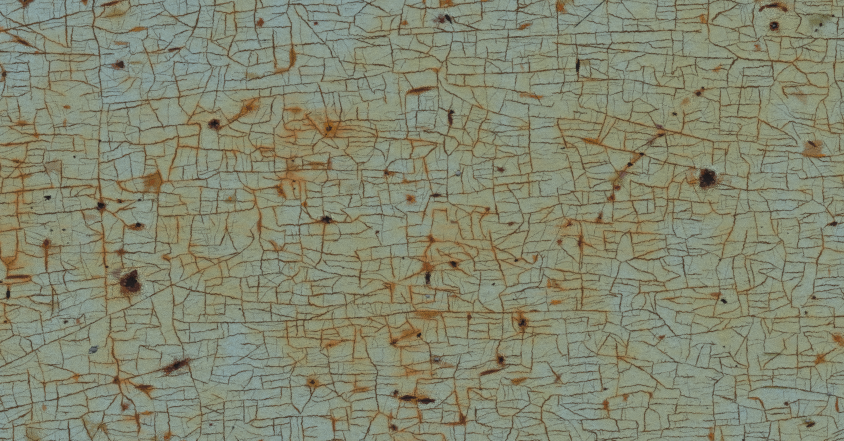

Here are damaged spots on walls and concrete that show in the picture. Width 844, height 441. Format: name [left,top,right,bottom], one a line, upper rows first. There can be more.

corrosion [138,170,163,201]
crack [499,348,534,373]